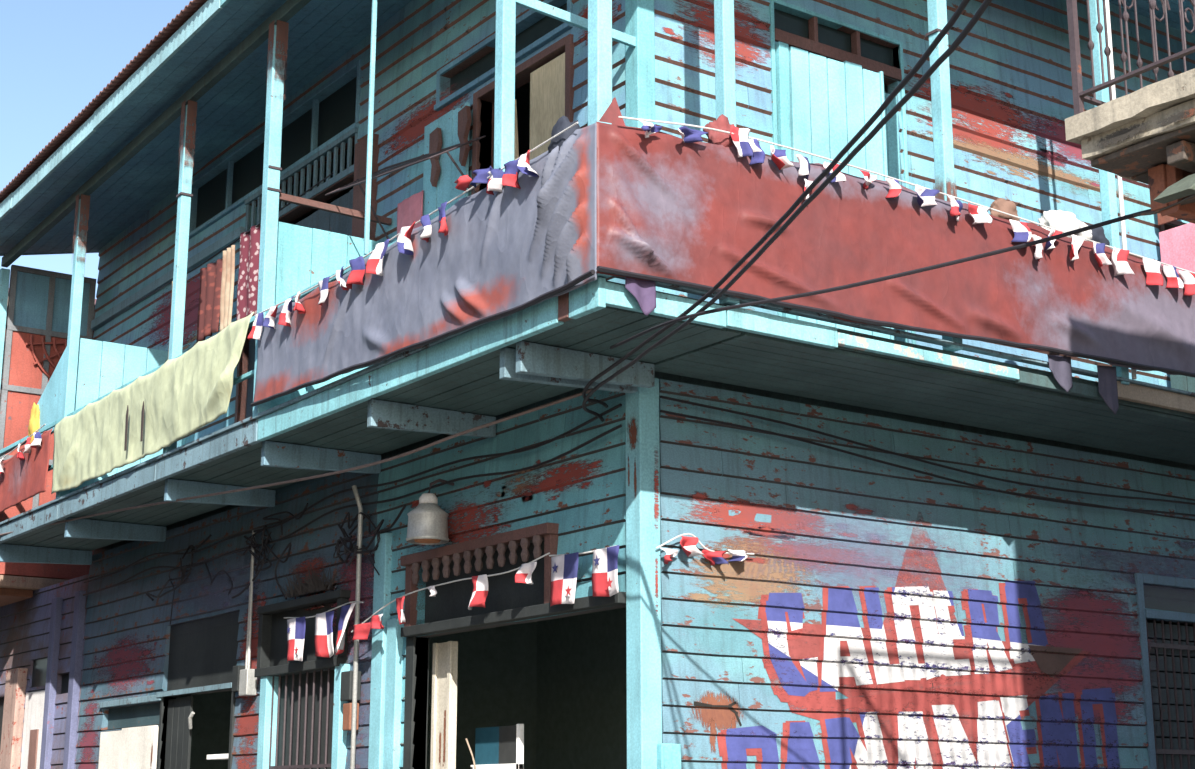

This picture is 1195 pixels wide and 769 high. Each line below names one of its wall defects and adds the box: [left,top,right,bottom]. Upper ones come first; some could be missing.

peeling [663,0,715,67]
peeling [734,1,771,67]
peeling [378,84,469,161]
peeling [905,72,933,142]
peeling [949,67,1101,204]
peeling [417,458,607,549]
peeling [677,491,971,611]
peeling [77,628,164,769]